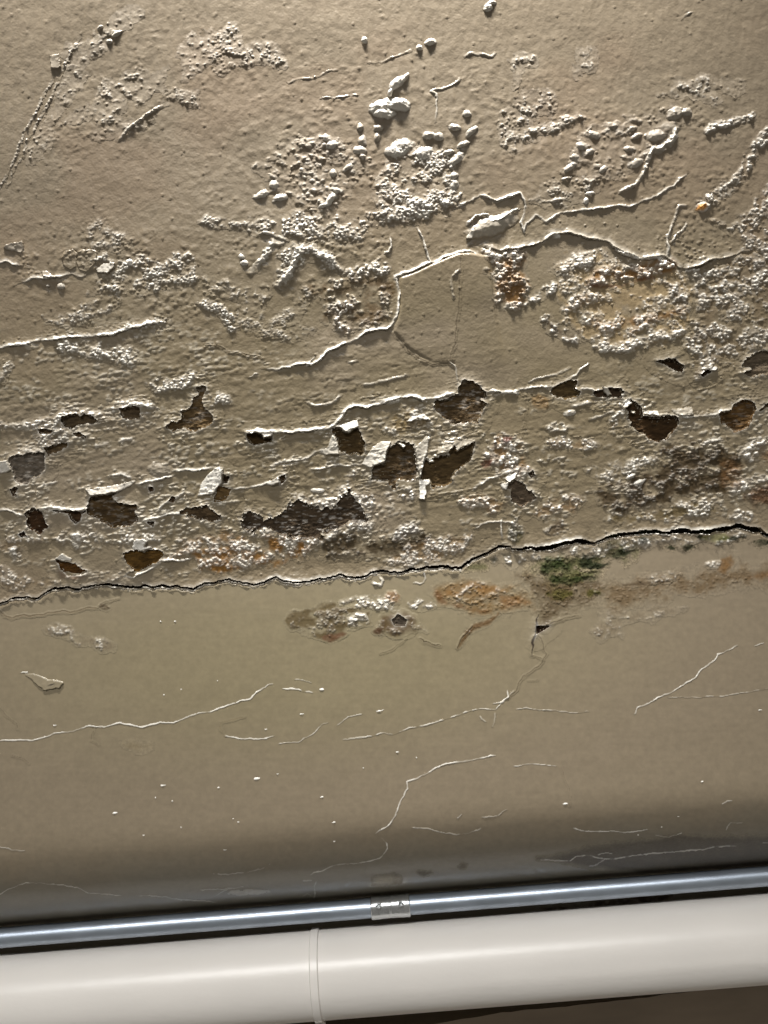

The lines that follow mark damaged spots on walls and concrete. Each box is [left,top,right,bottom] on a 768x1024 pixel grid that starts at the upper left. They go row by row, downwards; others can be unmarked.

spalling [528,336,768,455]
spalling [0,365,567,575]
spalling [283,599,429,641]
crack [0,510,768,622]
corrosion [427,571,531,651]
peeling [489,529,751,571]
crack [0,647,589,745]
crack [633,642,768,715]
crack [301,755,743,900]